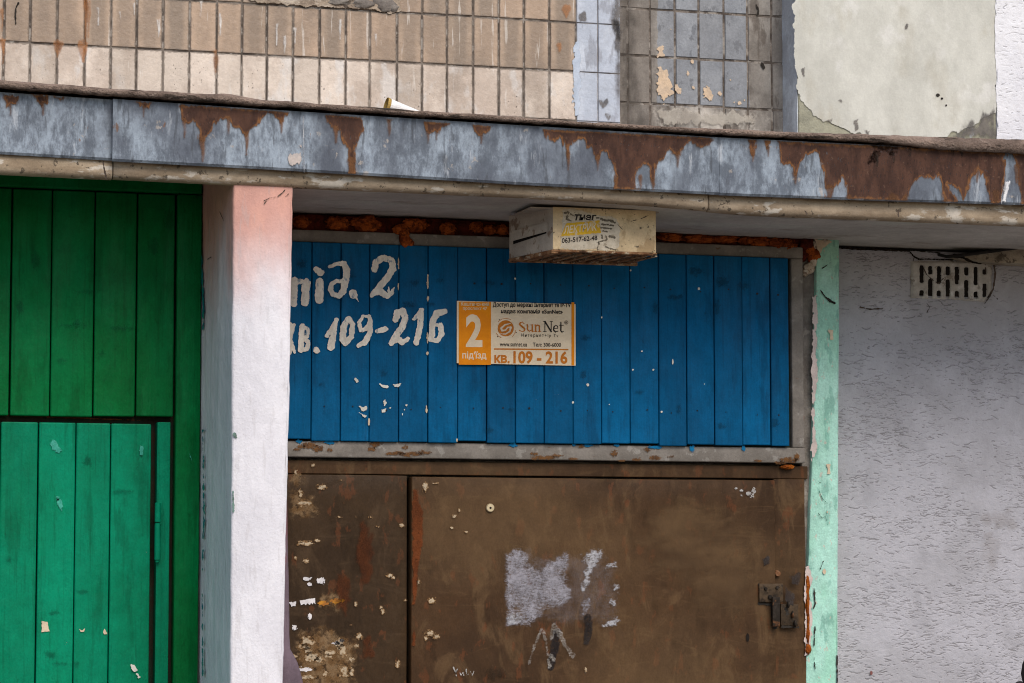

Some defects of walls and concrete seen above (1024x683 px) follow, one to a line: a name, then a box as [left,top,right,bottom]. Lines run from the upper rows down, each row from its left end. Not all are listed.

peeling [656,45,722,105]
rust [179,104,289,162]
rust [326,115,364,174]
rust [543,129,713,189]
rust [748,140,1024,204]
peeling [810,290,836,461]
peeling [804,566,826,656]
peeling [296,630,356,683]